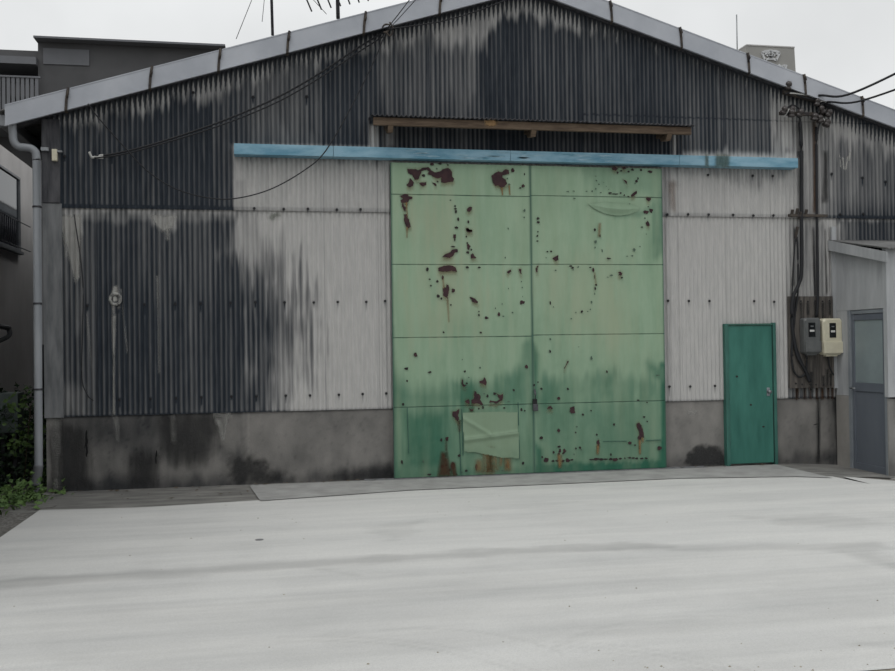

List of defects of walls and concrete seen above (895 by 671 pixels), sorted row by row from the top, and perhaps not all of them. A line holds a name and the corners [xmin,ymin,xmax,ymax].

water stain [62,216,80,279]
water stain [51,425,87,489]
water stain [232,457,280,483]
corrosion [439,447,456,476]
water stain [686,446,724,466]